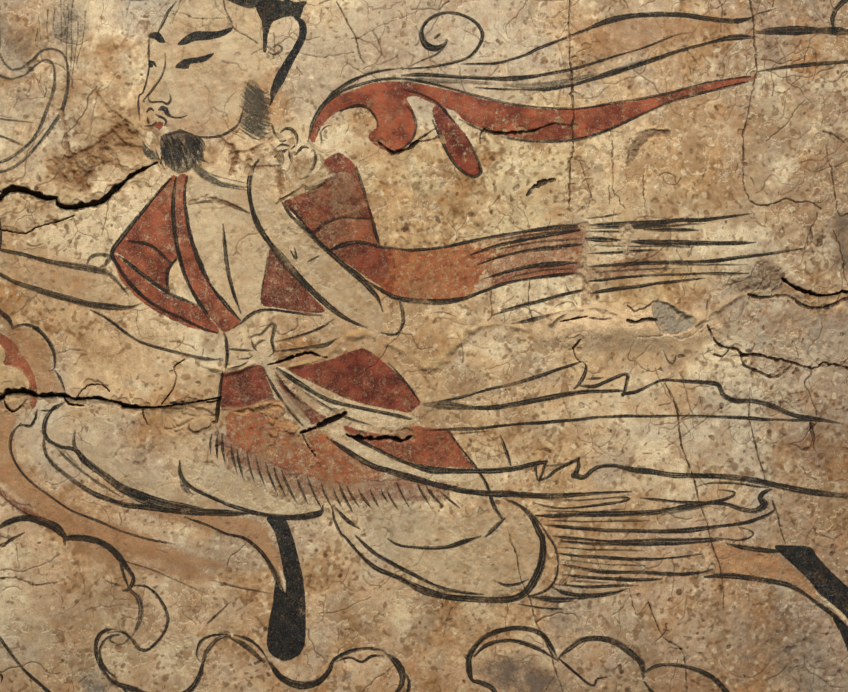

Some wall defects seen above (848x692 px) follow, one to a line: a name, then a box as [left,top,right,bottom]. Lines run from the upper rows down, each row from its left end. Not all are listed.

crack [742,0,848,268]
crack [0,92,158,233]
crack [747,278,848,309]
flaking render [653,302,694,334]
crack [707,325,848,378]
crack [0,379,221,423]
crack [300,411,412,456]